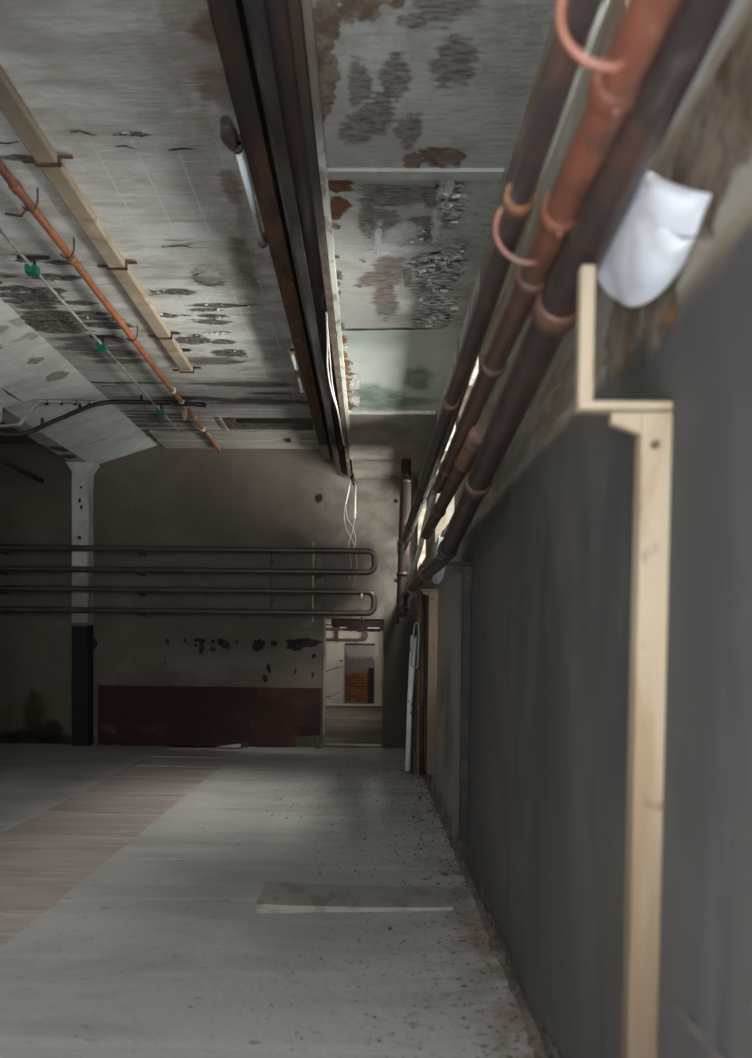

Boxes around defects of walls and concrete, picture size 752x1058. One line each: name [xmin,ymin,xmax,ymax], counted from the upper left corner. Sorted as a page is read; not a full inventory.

peeling [403,147,472,328]
damp [57,336,141,364]
flaking render [252,637,321,658]